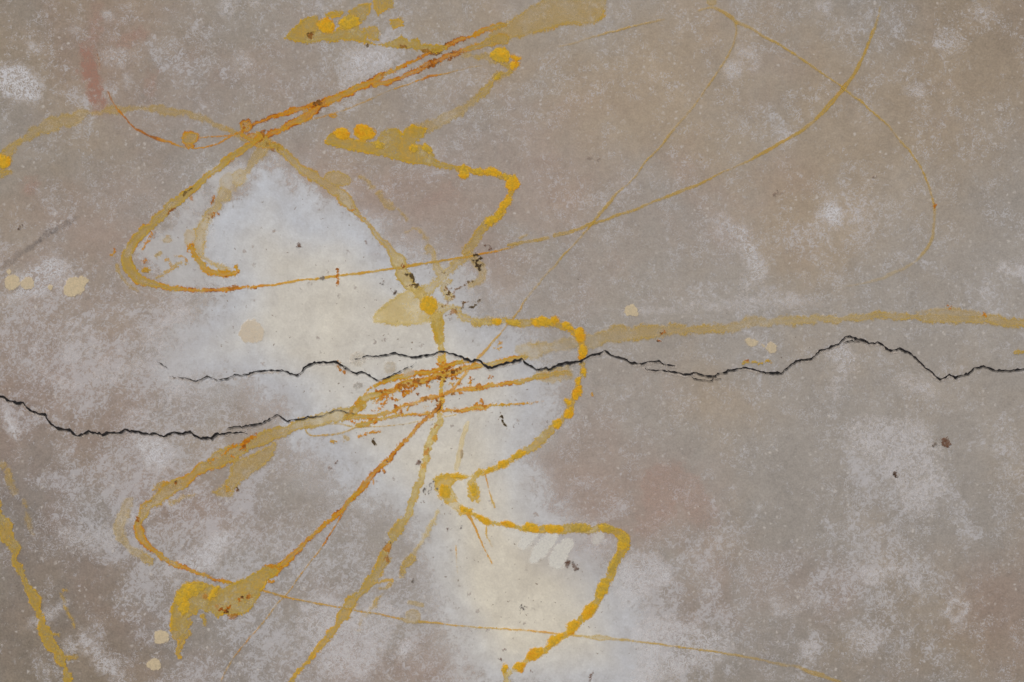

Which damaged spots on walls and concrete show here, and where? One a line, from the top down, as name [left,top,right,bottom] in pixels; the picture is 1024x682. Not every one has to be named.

crack [160,335,1024,383]
crack [0,395,353,440]